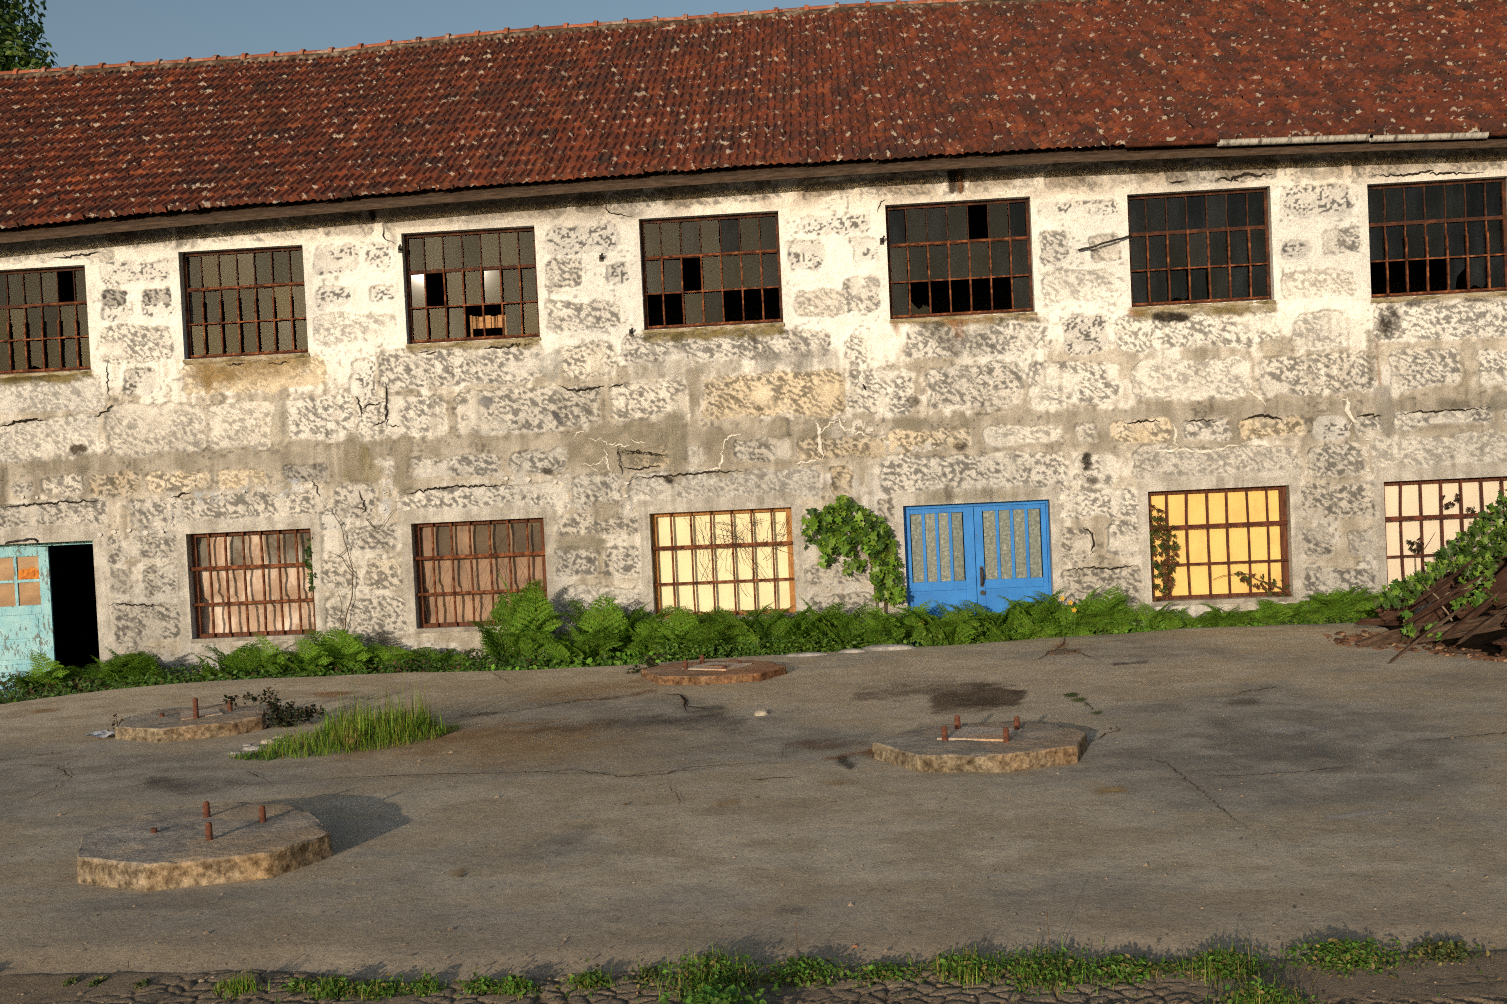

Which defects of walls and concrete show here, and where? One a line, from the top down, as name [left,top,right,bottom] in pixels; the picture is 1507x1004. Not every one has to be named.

crack [425,671,711,722]
damp [857,683,1025,711]
crack [0,743,122,807]
crack [237,733,899,802]